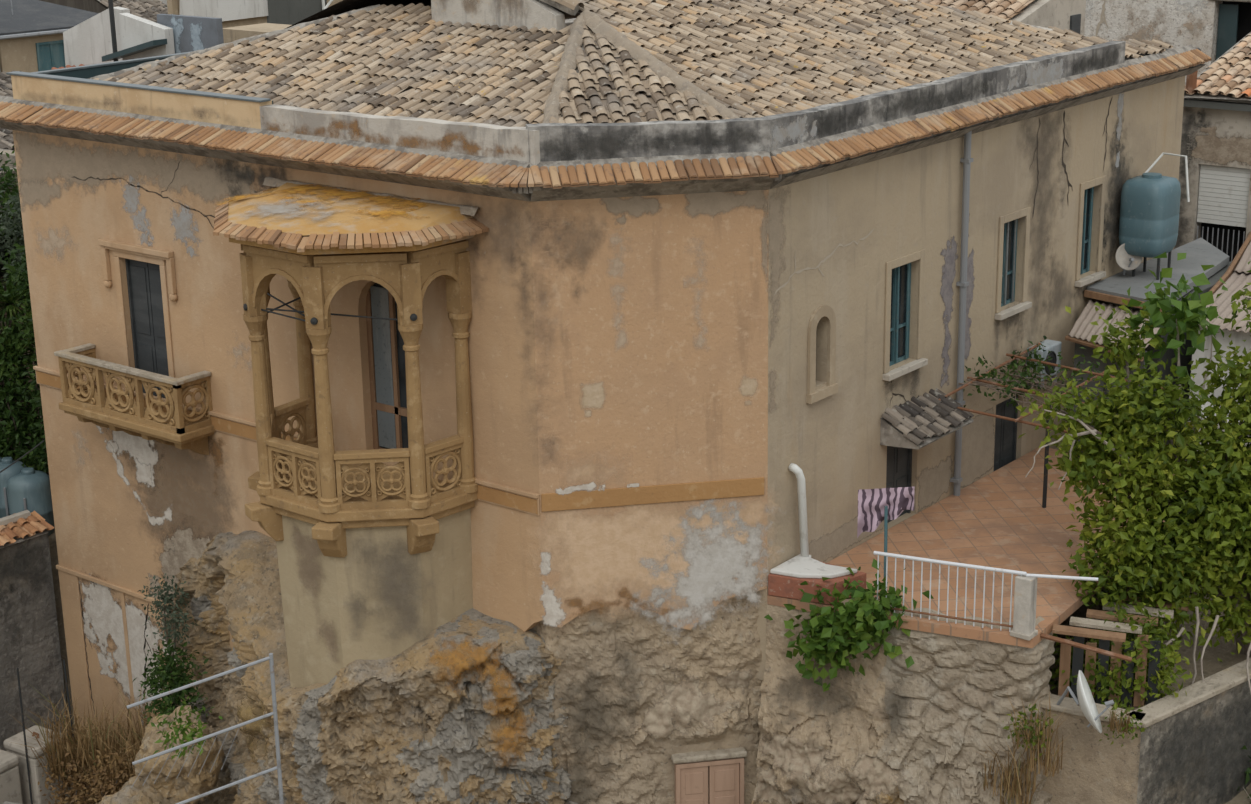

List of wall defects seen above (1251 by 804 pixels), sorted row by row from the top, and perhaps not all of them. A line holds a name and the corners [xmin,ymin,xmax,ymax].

crack [71,160,215,229]
crack [1031,111,1073,215]
leakage [1104,93,1126,257]
spalling [1191,126,1251,191]
peeling [79,425,211,725]
peeling [540,552,566,627]
peeling [631,499,768,629]